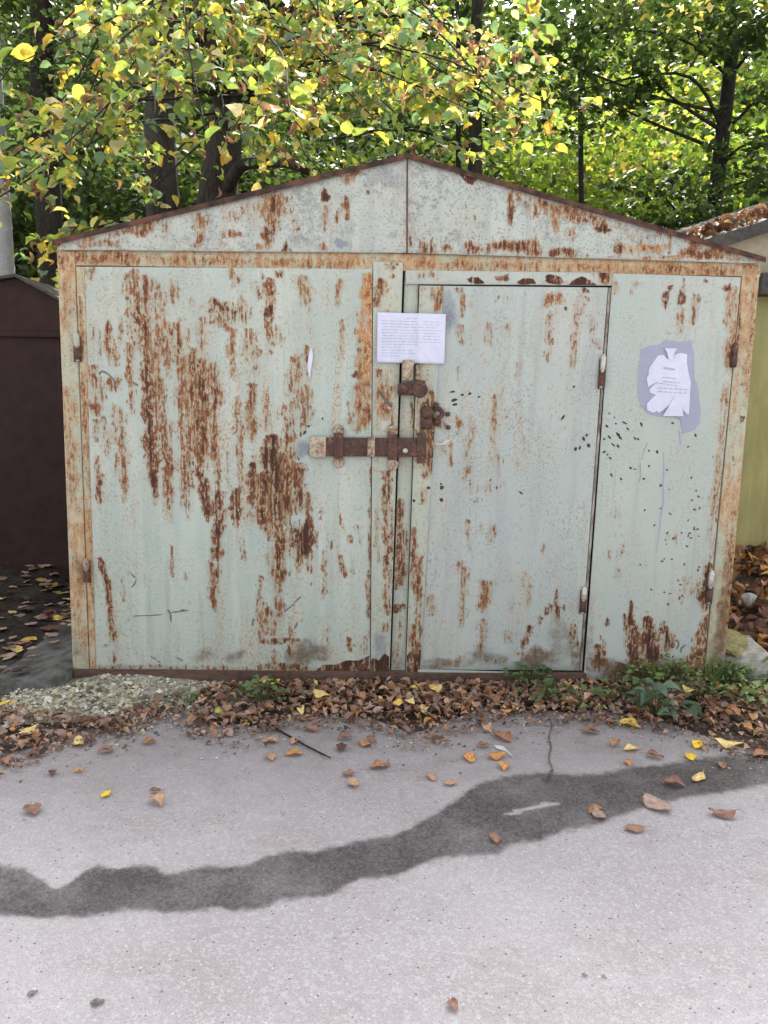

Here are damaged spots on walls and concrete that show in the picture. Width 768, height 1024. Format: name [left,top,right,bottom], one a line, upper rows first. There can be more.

corrosion [409,190,760,397]
corrosion [58,171,526,663]
corrosion [445,561,565,666]
corrosion [650,387,739,677]
water stain [0,755,768,917]
crack [545,722,553,783]